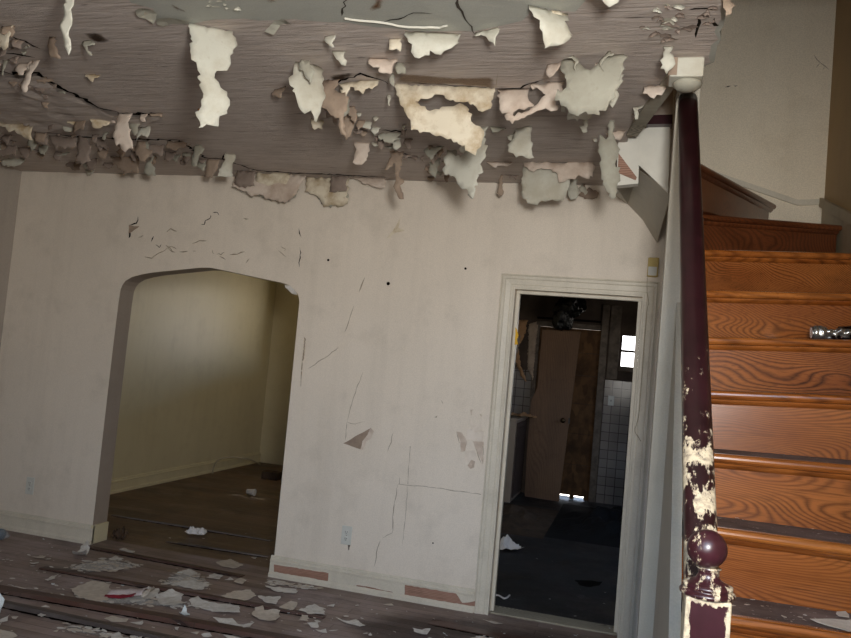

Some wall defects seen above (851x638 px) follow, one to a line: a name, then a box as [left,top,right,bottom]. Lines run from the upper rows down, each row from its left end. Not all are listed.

crack [455,0,475,34]
crack [0,37,155,115]
flaking render [0,0,735,208]
crack [53,133,378,177]
peeling [344,428,374,450]
crack [374,434,481,566]
peeling [274,565,329,581]
peeling [405,585,475,606]